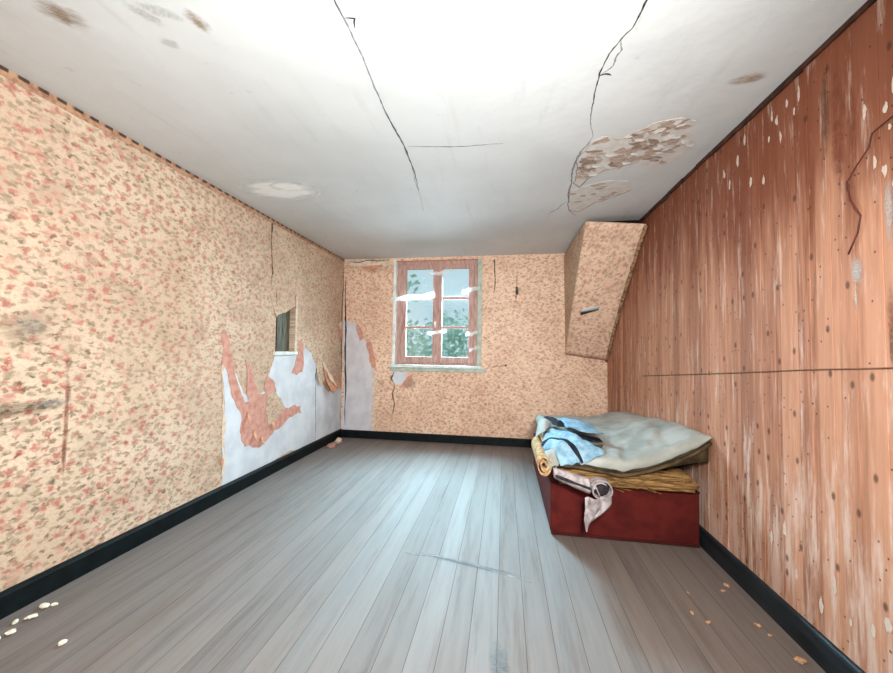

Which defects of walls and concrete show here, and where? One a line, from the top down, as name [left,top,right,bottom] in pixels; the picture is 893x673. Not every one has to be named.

crack [334,0,503,211]
crack [547,0,651,216]
peeling [573,118,696,188]
peeling [220,320,377,485]